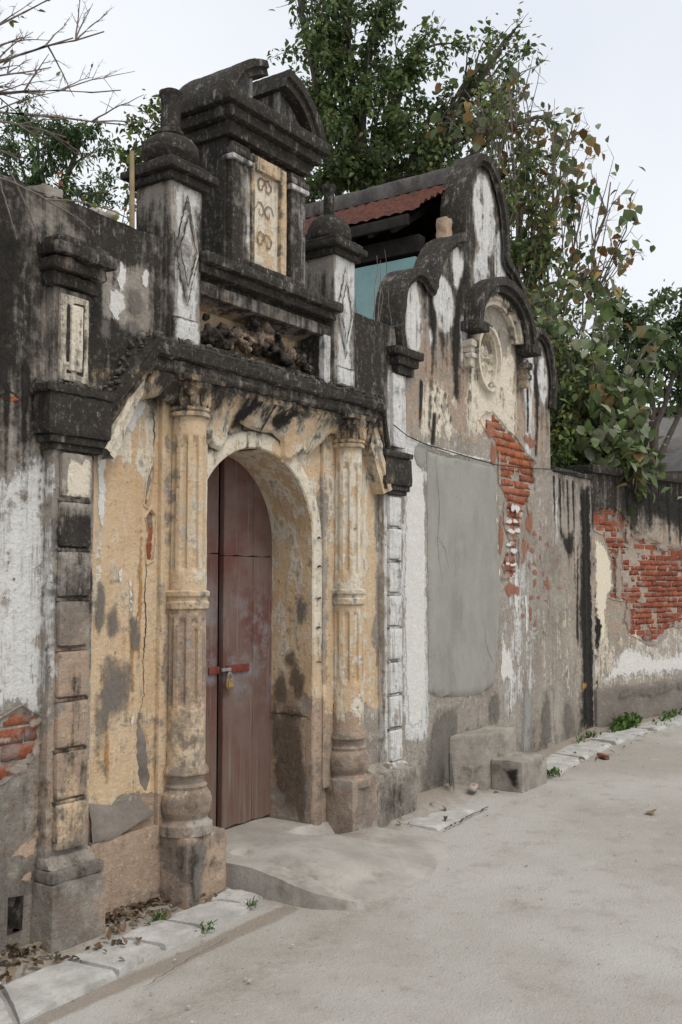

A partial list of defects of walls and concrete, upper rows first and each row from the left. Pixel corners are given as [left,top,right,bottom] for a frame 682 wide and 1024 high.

leakage [453,267,466,399]
flaking render [0,704,42,785]
peeling [403,450,426,726]
flaking render [427,411,551,634]
peeling [500,634,515,716]
leakage [541,692,551,745]
leakage [553,475,602,734]
flaking render [592,505,682,682]